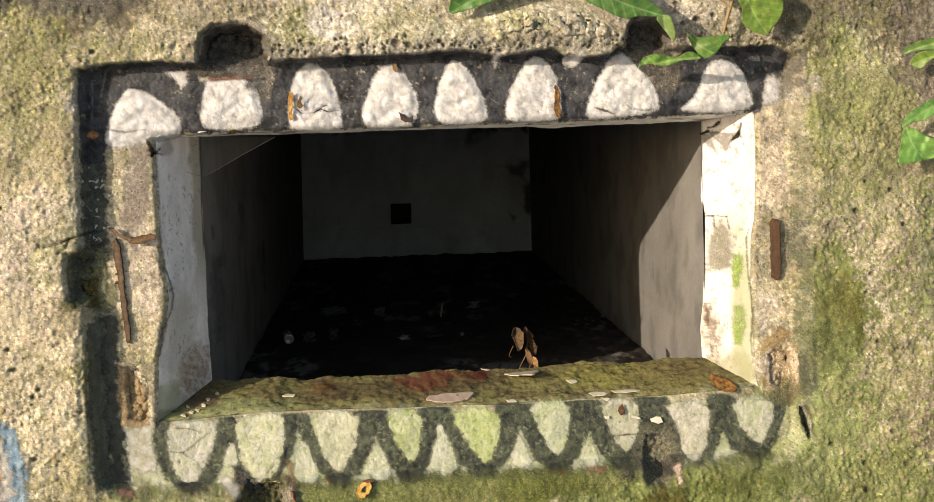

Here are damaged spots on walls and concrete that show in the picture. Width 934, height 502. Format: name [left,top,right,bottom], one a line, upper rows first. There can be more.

spalling [195,18,277,100]
spalling [623,16,684,94]
corrosion [769,218,782,280]
corrosion [112,238,131,343]
spalling [115,362,156,428]
leakage [797,321,832,395]